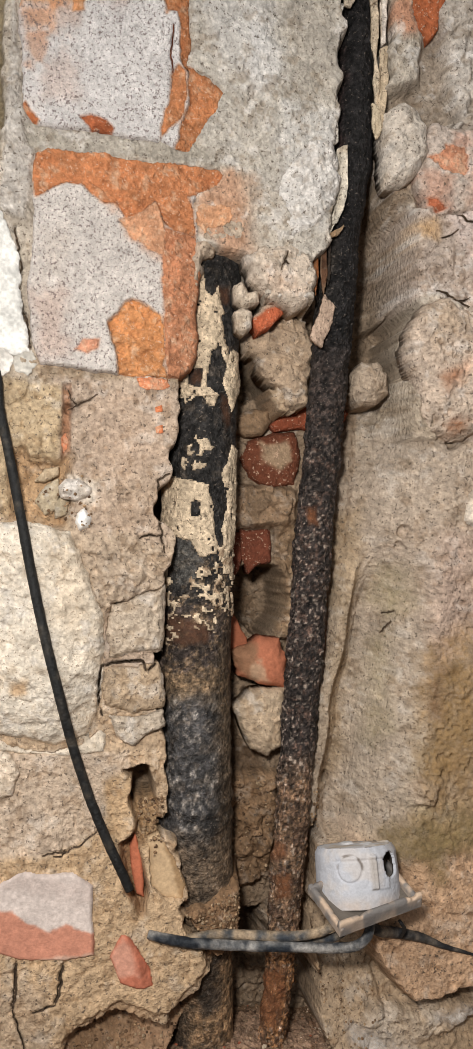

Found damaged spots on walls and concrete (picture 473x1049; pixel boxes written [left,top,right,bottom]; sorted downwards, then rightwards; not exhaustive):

spalling [33,0,241,412]
crack [442,214,473,238]
crack [436,290,470,308]
crack [139,473,170,553]
flaking render [160,435,238,646]
corrosion [164,615,208,644]
crack [97,658,156,716]
crack [11,963,64,1049]